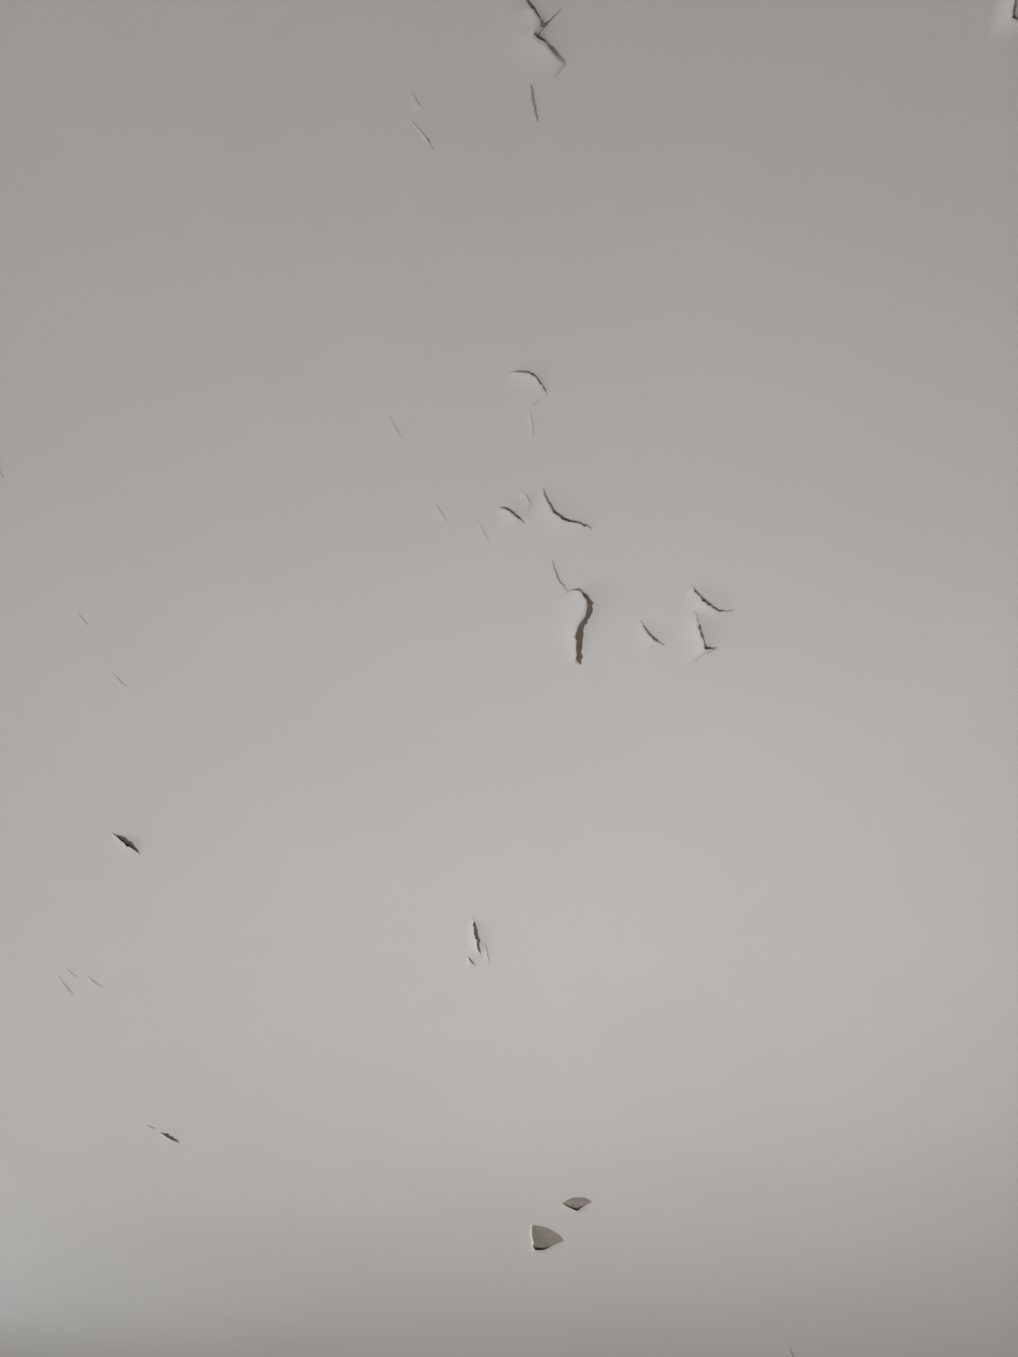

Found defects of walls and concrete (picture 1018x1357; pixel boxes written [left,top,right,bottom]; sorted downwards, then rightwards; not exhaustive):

peeling [988,0,1018,40]
peeling [486,0,566,122]
peeling [496,488,592,544]
peeling [550,561,594,665]
peeling [633,585,734,667]
peeling [465,917,490,971]
peeling [560,1197,592,1217]
peeling [528,1225,564,1255]